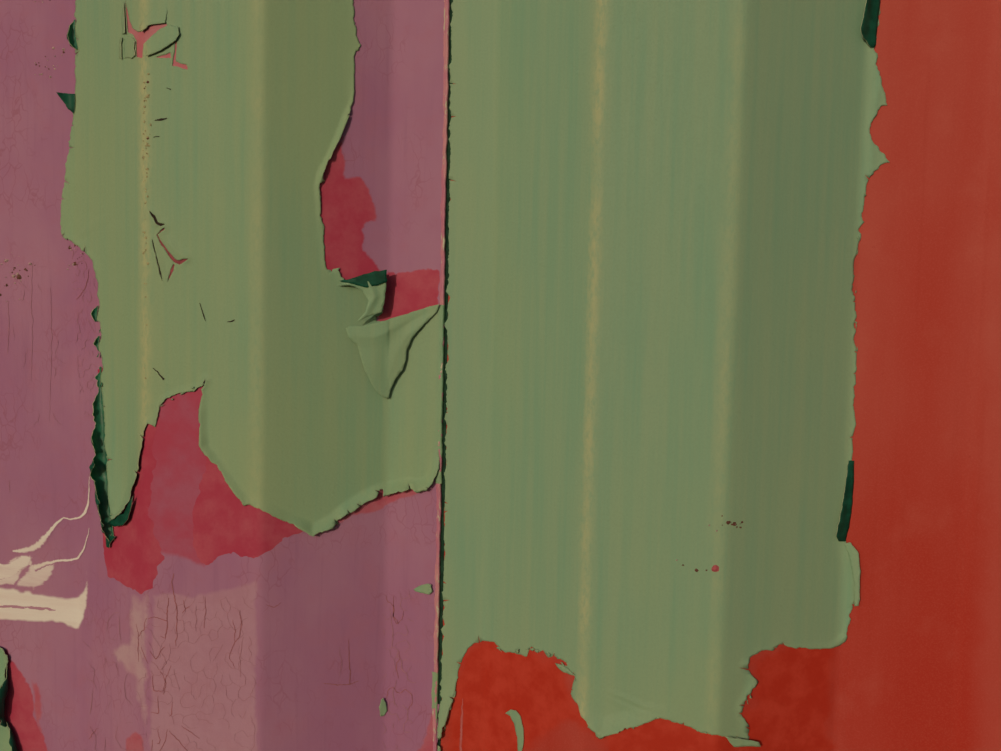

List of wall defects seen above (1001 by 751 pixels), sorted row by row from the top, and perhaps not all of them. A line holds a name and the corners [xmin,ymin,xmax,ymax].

crack [150,212,187,280]
peeling [56,0,445,548]
peeling [431,0,890,751]
peeling [0,647,17,751]
crack [83,573,280,751]
peeling [109,576,262,751]
peeling [413,584,432,595]